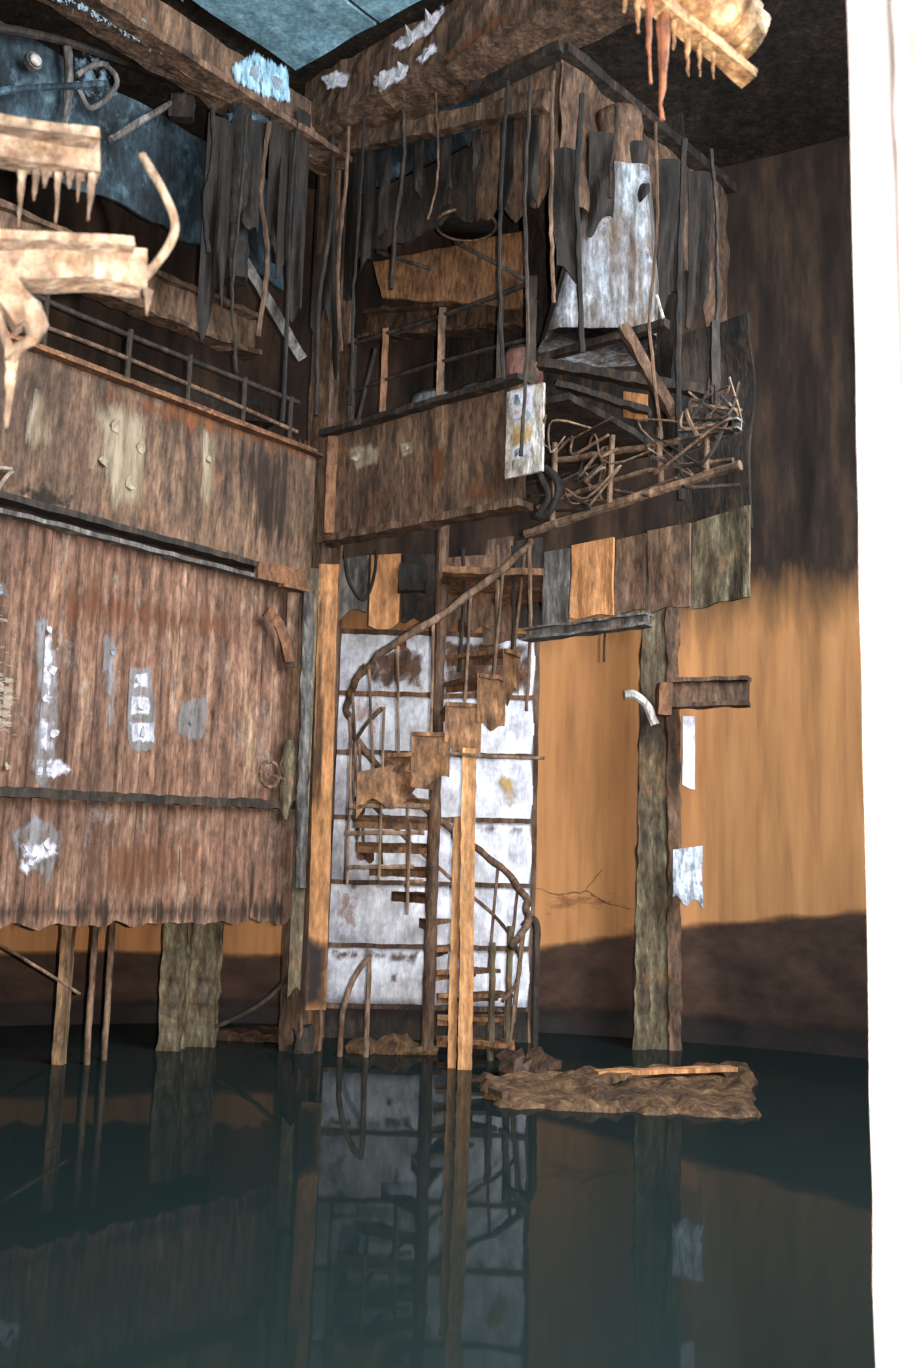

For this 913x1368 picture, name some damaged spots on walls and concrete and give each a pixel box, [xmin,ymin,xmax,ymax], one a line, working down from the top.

peeling [32,619,69,787]
peeling [13,816,60,883]